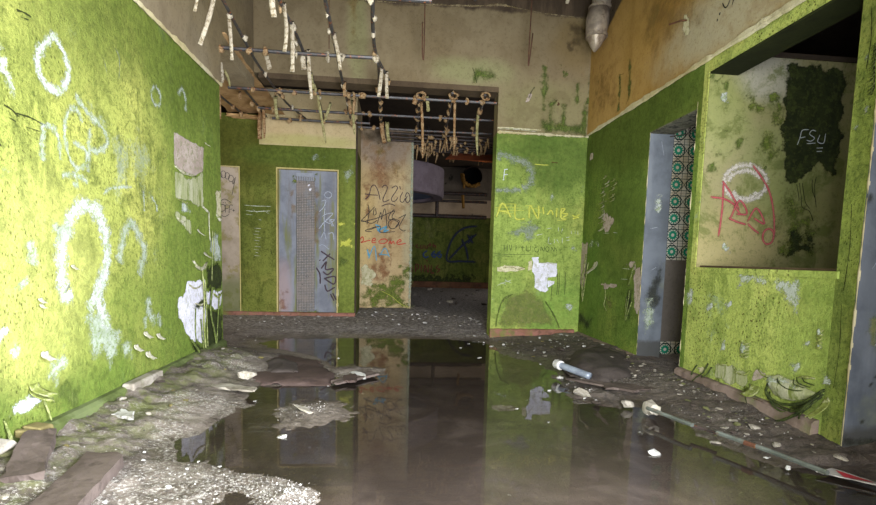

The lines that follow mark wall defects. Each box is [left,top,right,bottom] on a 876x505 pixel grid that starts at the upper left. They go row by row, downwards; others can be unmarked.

leakage [542,82,590,135]
peeling [174,132,223,353]
peeling [497,257,566,296]
peeling [13,382,57,421]